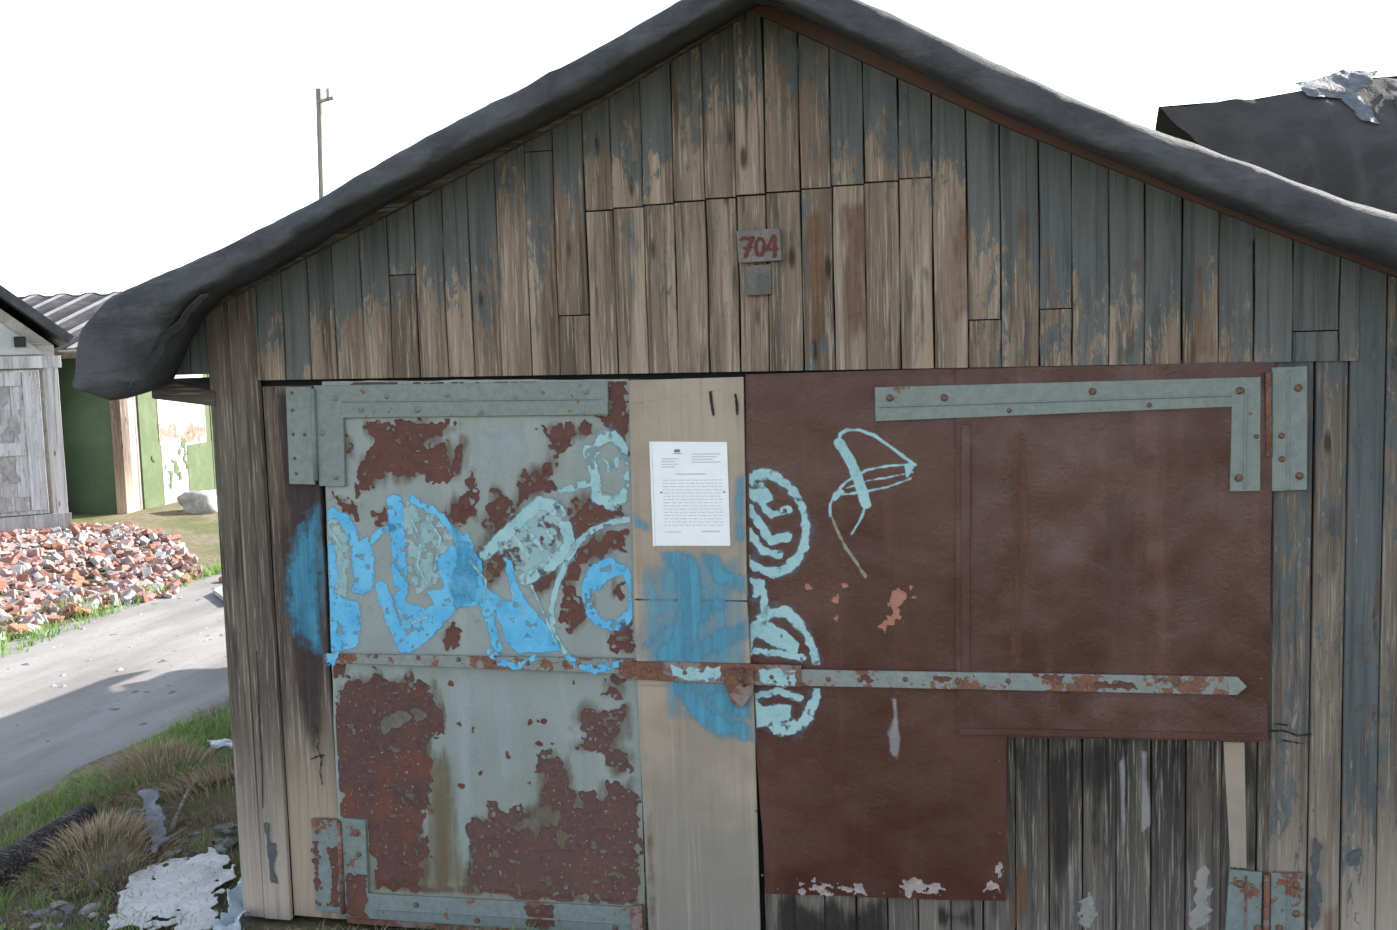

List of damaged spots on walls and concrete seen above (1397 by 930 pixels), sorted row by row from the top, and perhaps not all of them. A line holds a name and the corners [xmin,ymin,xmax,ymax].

peeling [152,431,200,489]
corrosion [331,381,630,634]
corrosion [443,621,462,651]
corrosion [607,620,636,654]
corrosion [1094,680,1138,691]
corrosion [310,663,643,930]
corrosion [798,877,867,896]
corrosion [899,877,946,898]
corrosion [983,862,1004,893]